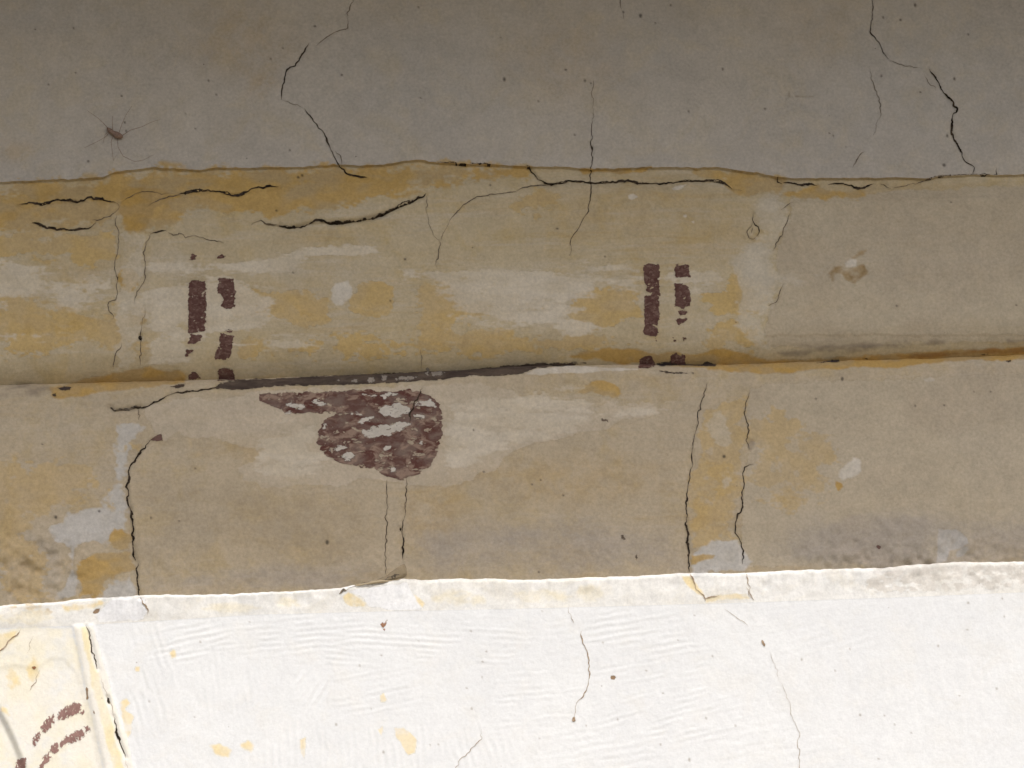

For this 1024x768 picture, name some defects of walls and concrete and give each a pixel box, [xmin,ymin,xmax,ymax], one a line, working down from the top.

damp [0,155,563,287]
crack [281,2,367,178]
crack [252,81,735,260]
damp [690,167,868,209]
crack [775,1,997,247]
crack [110,387,216,611]
damp [0,442,381,655]
peeling [286,399,326,414]
peeling [336,445,355,461]
peeling [351,392,437,424]
damp [0,256,1024,404]
crack [684,384,754,622]